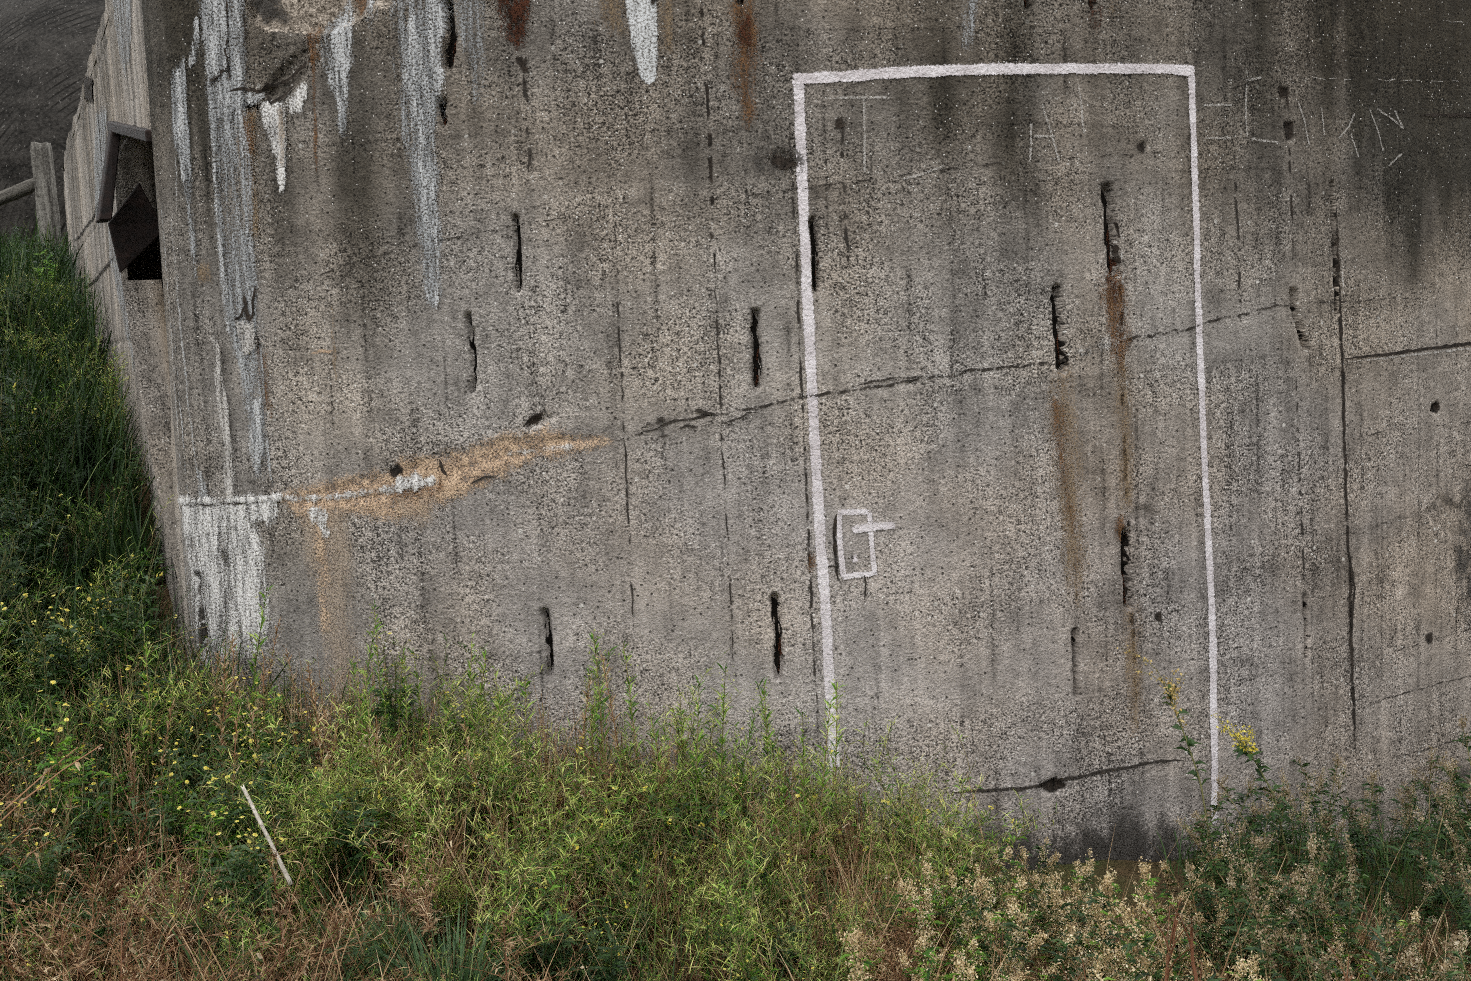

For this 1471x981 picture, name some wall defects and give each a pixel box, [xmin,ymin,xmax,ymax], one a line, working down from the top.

rust [496,0,530,101]
crack [698,8,706,46]
rust [732,0,759,123]
efflorescence [320,0,484,310]
efflorescence [171,0,266,477]
crack [610,77,1471,749]
rust [1100,230,1131,541]
damp [182,501,266,648]
crack [951,759,1186,793]